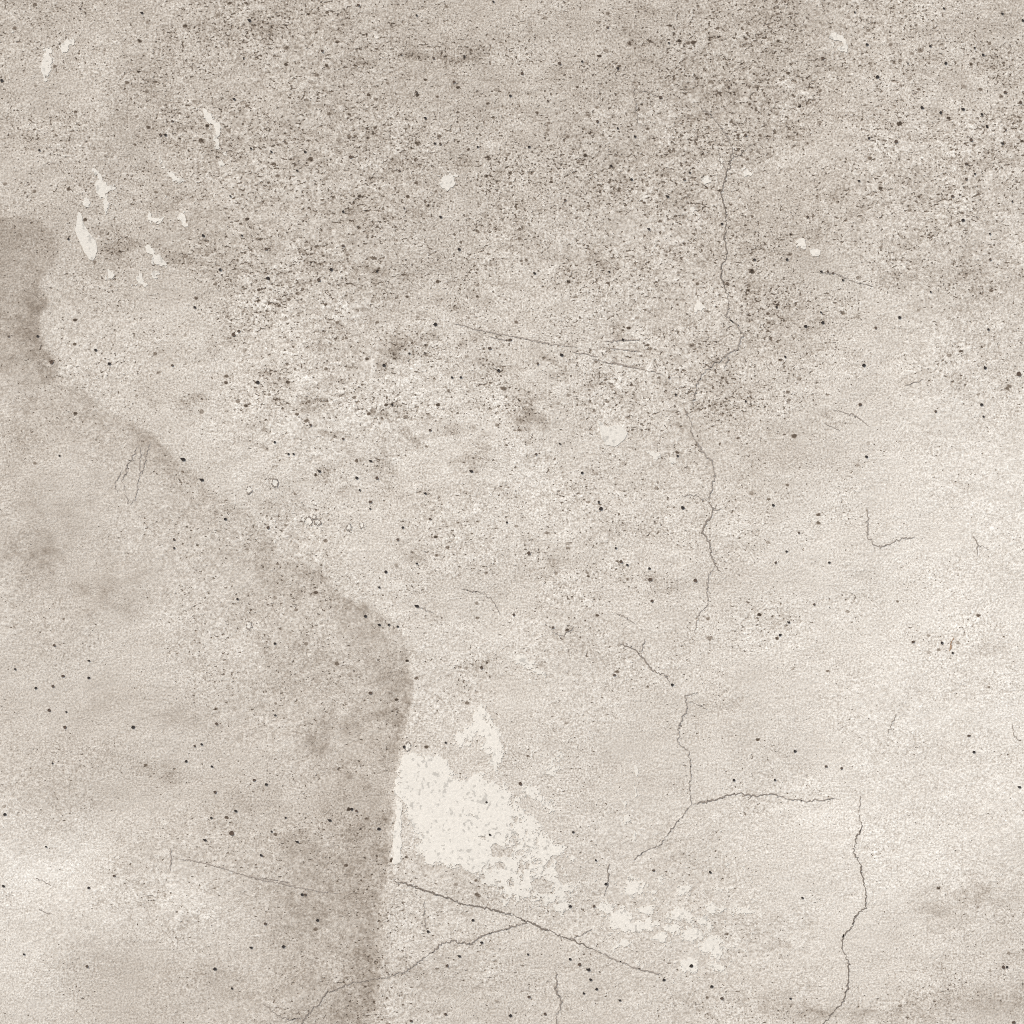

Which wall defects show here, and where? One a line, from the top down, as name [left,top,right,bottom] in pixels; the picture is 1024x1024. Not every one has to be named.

peeling [39,37,74,82]
peeling [192,107,227,167]
peeling [75,168,116,260]
peeling [131,245,167,287]
crack [683,106,751,632]
crack [865,509,913,548]
water stain [0,210,417,1024]
crack [616,613,832,860]
peeling [392,704,577,917]
crack [263,881,660,1024]
crack [823,796,867,1024]